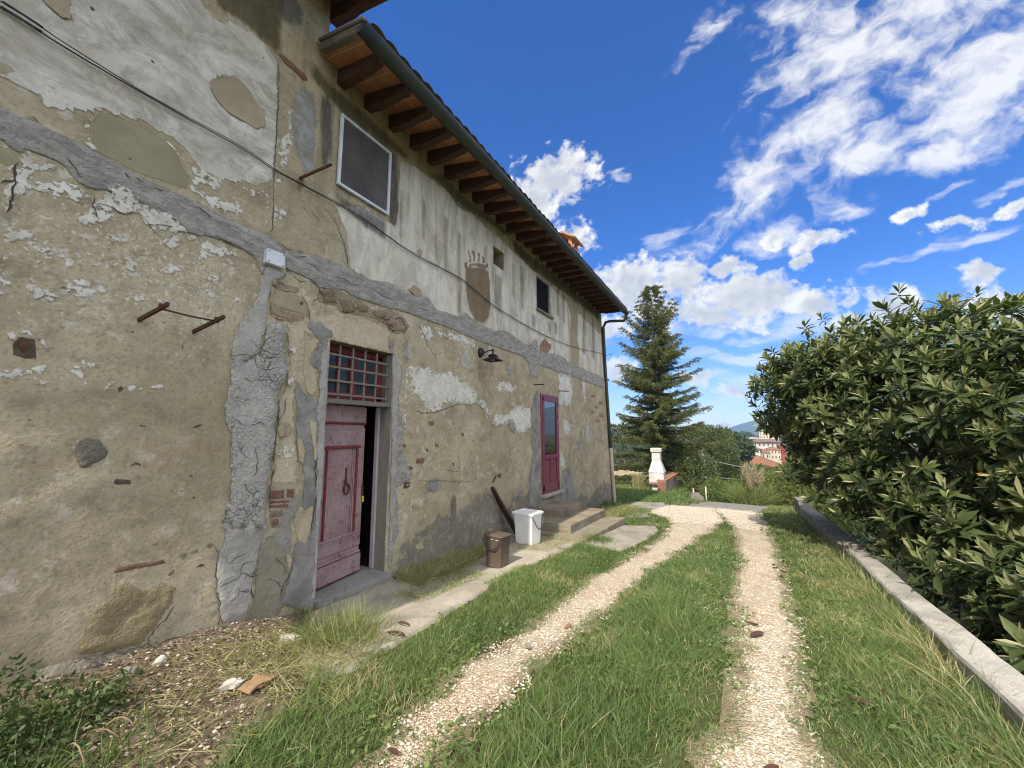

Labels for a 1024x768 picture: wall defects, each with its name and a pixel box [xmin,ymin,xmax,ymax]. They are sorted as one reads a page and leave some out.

crack [1,163,18,213]
peeling [25,279,106,309]
peeling [65,360,103,386]
peeling [2,150,240,303]
peeling [102,381,164,392]
peeling [0,0,307,225]
crack [67,59,436,663]
flaking render [241,280,476,623]
peeling [330,161,603,433]